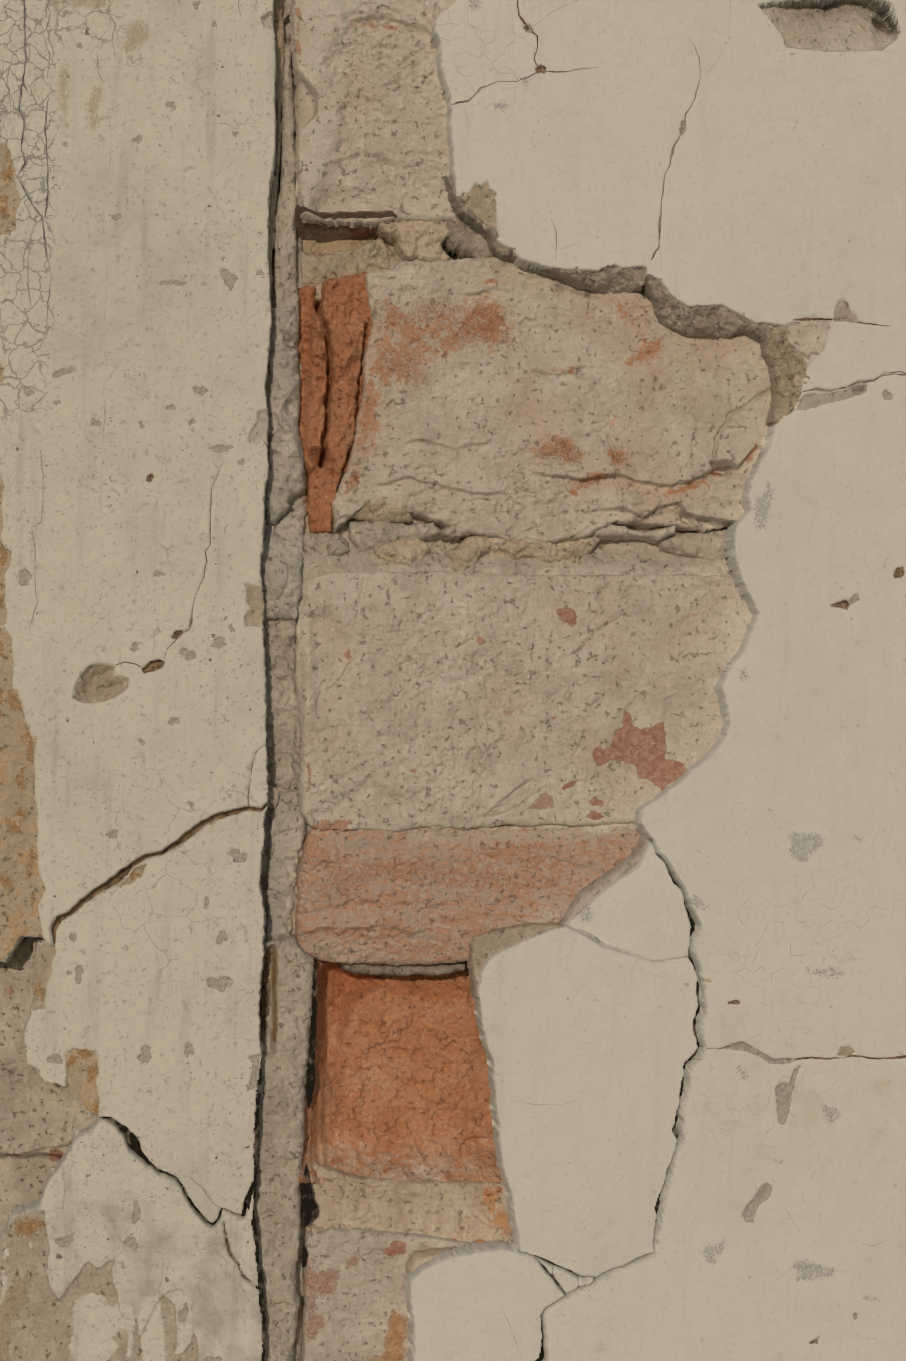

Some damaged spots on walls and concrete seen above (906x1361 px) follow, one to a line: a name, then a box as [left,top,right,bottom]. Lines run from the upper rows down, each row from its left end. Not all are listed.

crack [432,0,598,124]
spalling [760,0,902,52]
spalling [444,175,892,426]
spalling [0,476,84,1010]
crack [51,747,268,944]
spalling [467,834,648,999]
crack [567,855,906,1230]
peeling [724,1042,801,1125]
peeling [0,1161,222,1361]
crack [103,1059,266,1361]
crack [501,1306,544,1361]
crack [534,1255,585,1293]